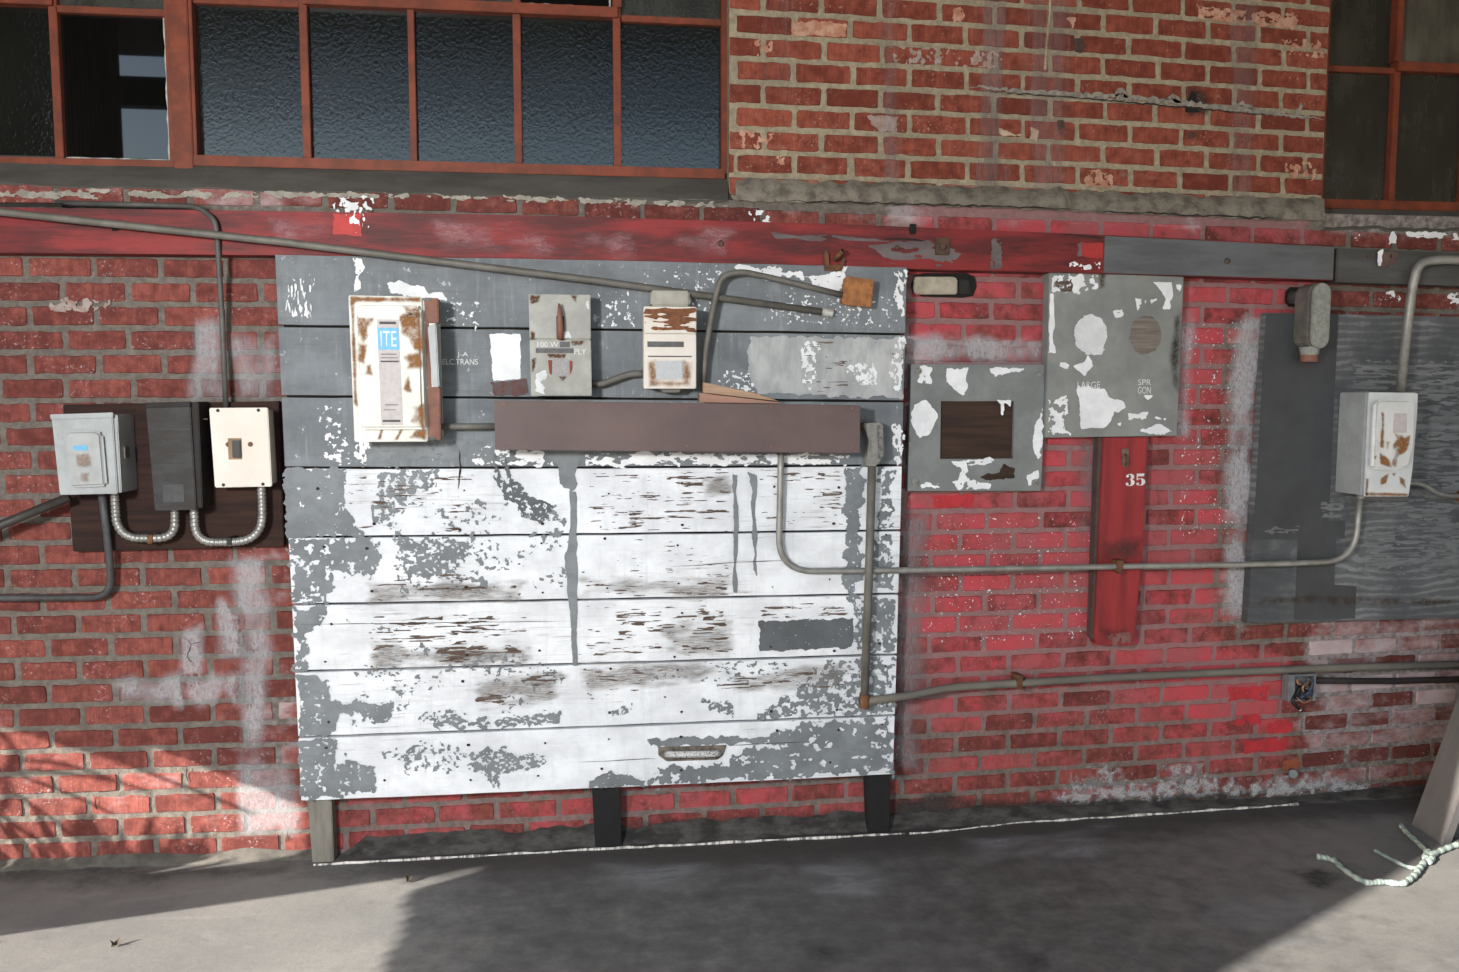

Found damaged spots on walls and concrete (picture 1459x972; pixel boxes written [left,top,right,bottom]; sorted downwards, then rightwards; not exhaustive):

peeling [0,188,409,236]
peeling [1377,231,1459,267]
spalling [49,297,111,312]
peeling [282,130,1325,801]
damp [157,564,262,729]
damp [1019,764,1365,807]